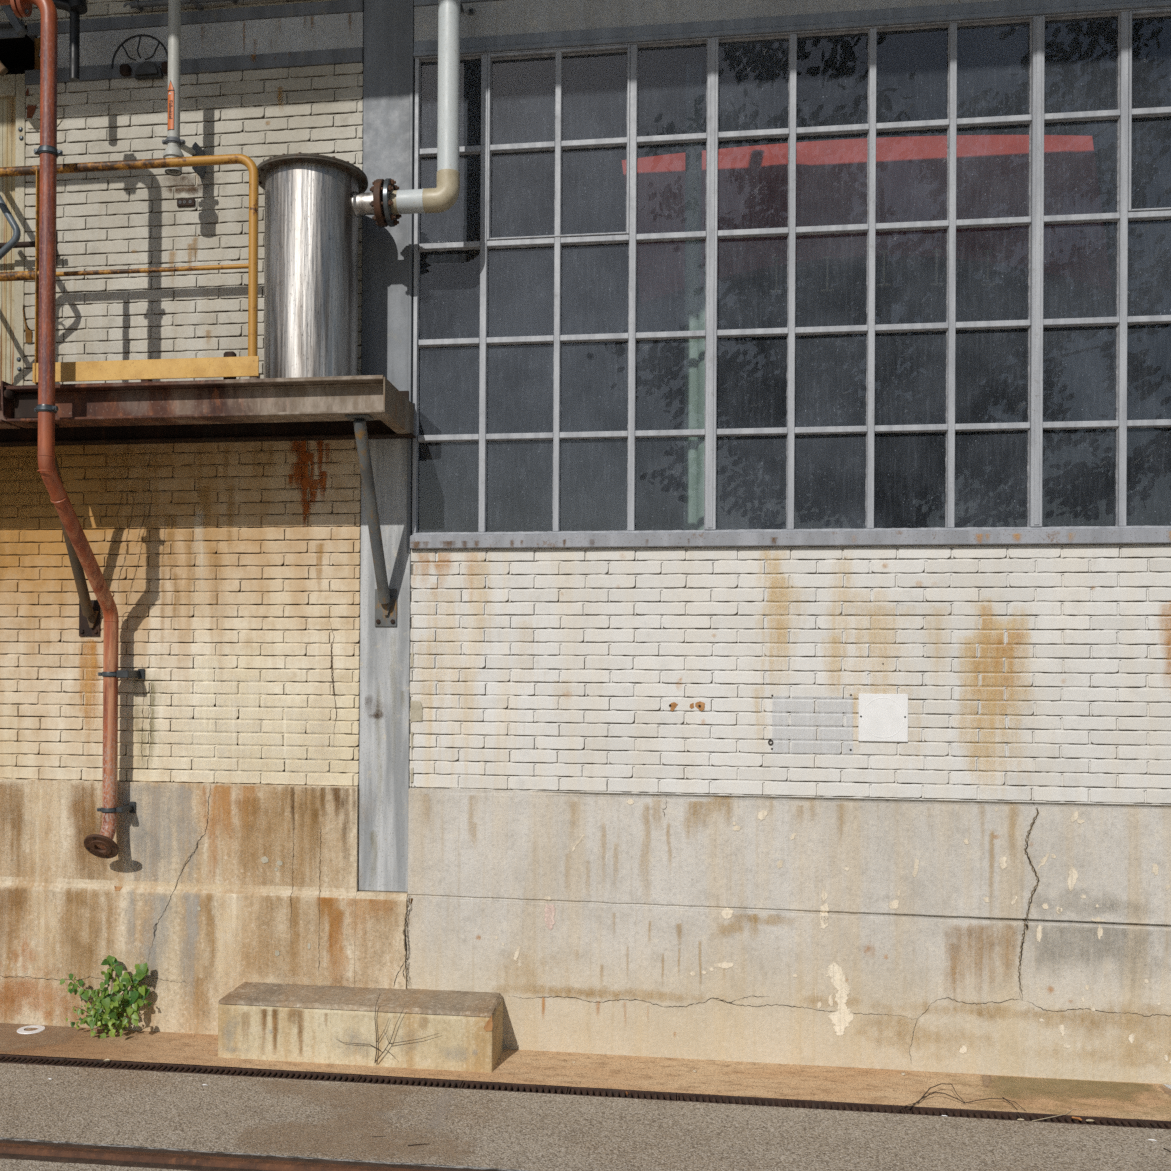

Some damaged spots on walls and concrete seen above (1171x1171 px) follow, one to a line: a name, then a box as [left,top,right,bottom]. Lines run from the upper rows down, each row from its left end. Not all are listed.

rust [289,440,329,521]
rust [312,787,340,825]
rust [318,897,342,965]
crack [393,896,411,987]
crack [509,802,1171,1056]
rust [0,986,81,1052]
rust [263,1009,277,1045]
spalling [815,963,853,1036]